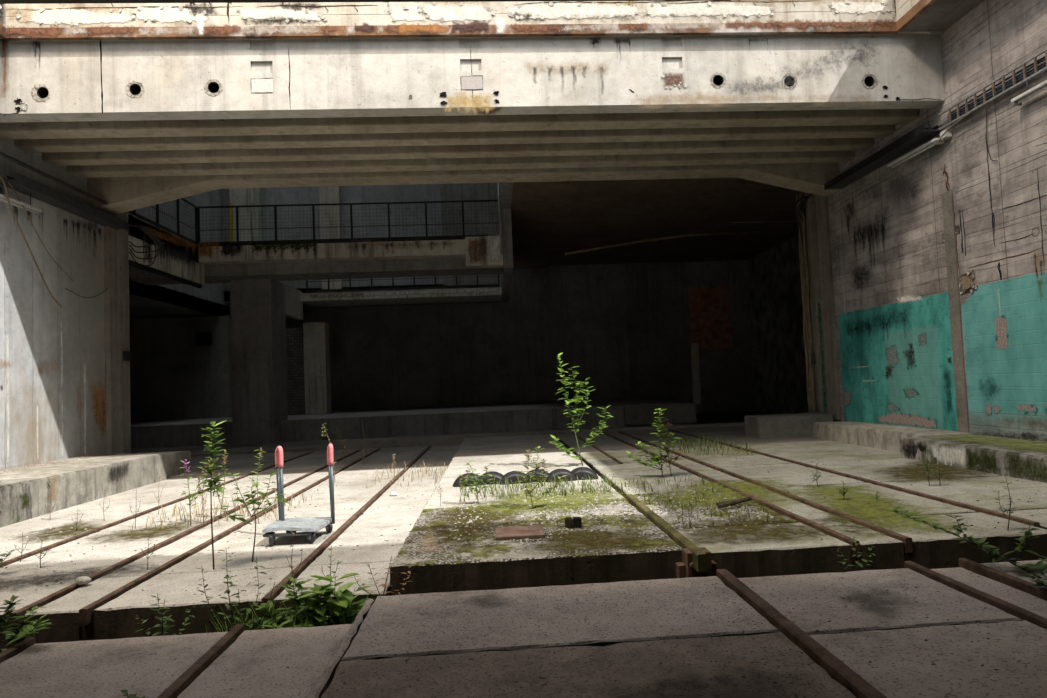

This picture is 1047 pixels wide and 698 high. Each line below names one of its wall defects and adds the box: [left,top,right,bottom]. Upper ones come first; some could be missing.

peeling [236,6,327,23]
peeling [387,2,495,23]
peeling [508,1,774,20]
corrosion [354,20,490,34]
corrosion [511,24,560,34]
corrosion [619,23,648,31]
peeling [994,315,1008,349]
peeling [885,331,927,370]
peeling [878,388,937,429]